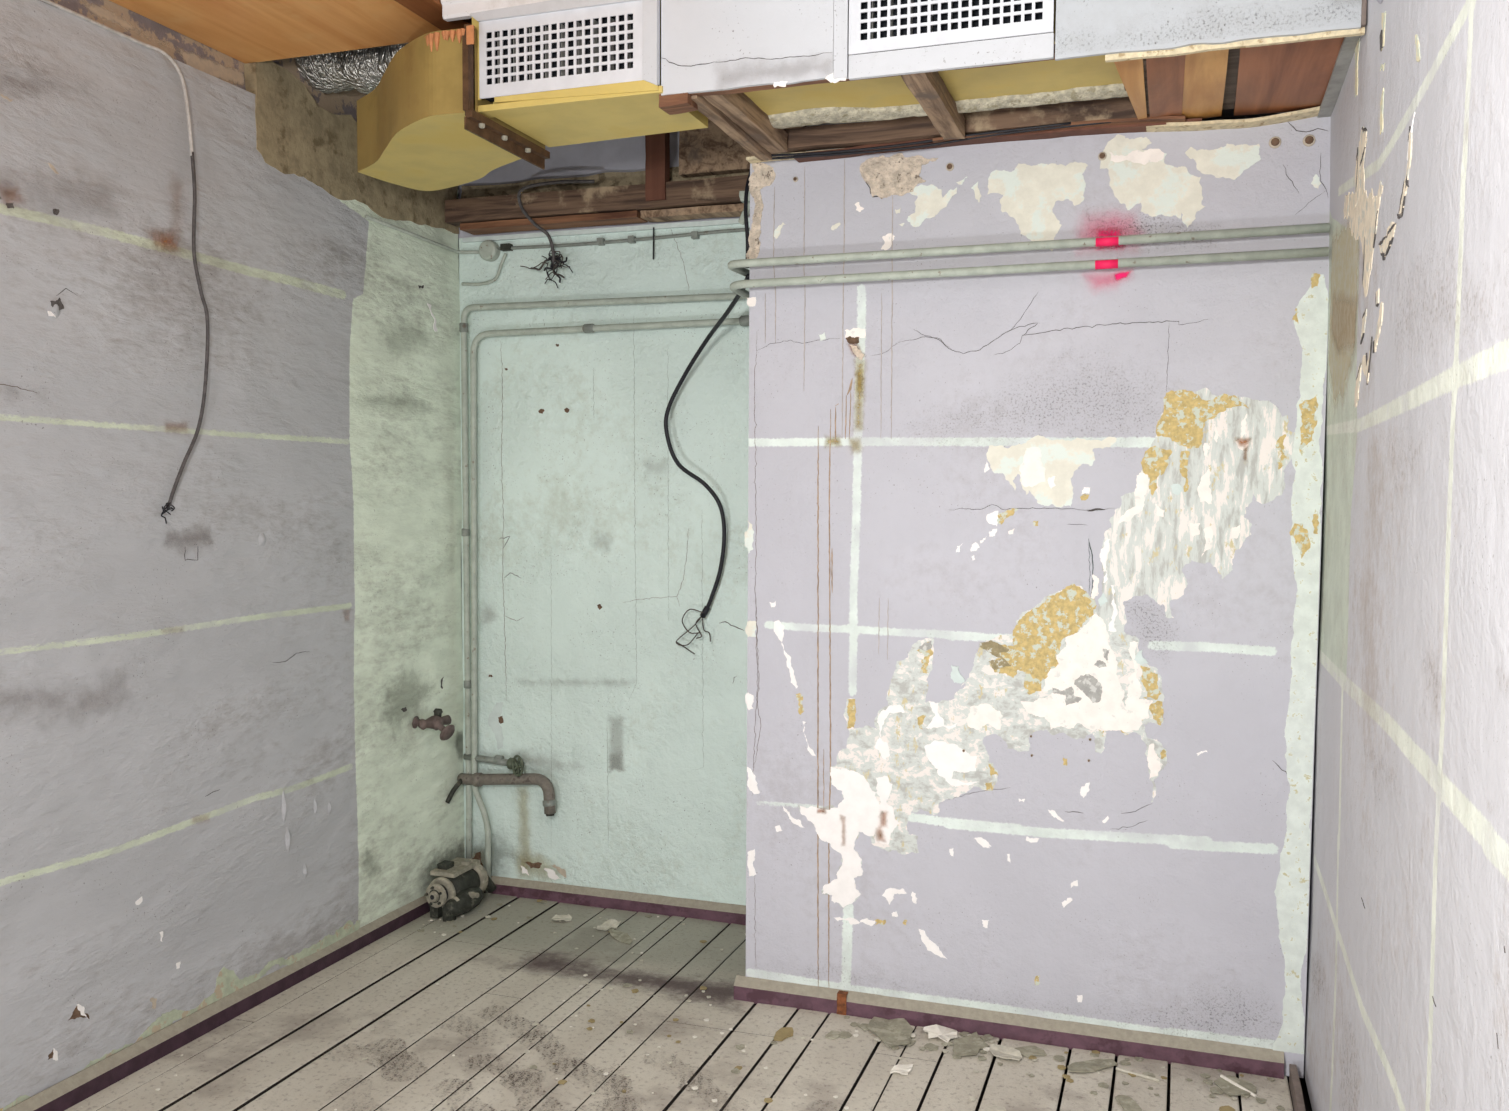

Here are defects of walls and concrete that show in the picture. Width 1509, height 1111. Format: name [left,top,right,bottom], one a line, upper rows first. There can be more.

peeling [746,162,786,259]
peeling [855,134,1261,251]
crack [1283,122,1328,215]
peeling [1343,0,1415,407]
peeling [744,521,754,554]
peeling [745,693,754,710]
peeling [745,621,756,637]
peeling [770,273,1329,1054]
peeling [747,767,760,794]
peeling [747,849,756,876]